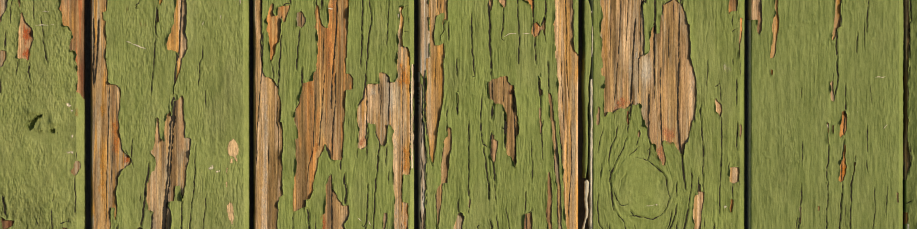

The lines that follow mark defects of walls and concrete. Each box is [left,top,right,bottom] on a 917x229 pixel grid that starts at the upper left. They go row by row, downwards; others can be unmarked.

peeling [0,0,34,67]
peeling [58,0,131,229]
peeling [137,0,191,229]
peeling [253,0,353,229]
peeling [356,0,453,229]
crack [256,0,572,229]
peeling [487,76,519,168]
peeling [522,0,578,229]
peeling [596,0,697,166]
crack [597,0,741,229]
peeling [692,184,704,229]
peeling [727,0,779,58]